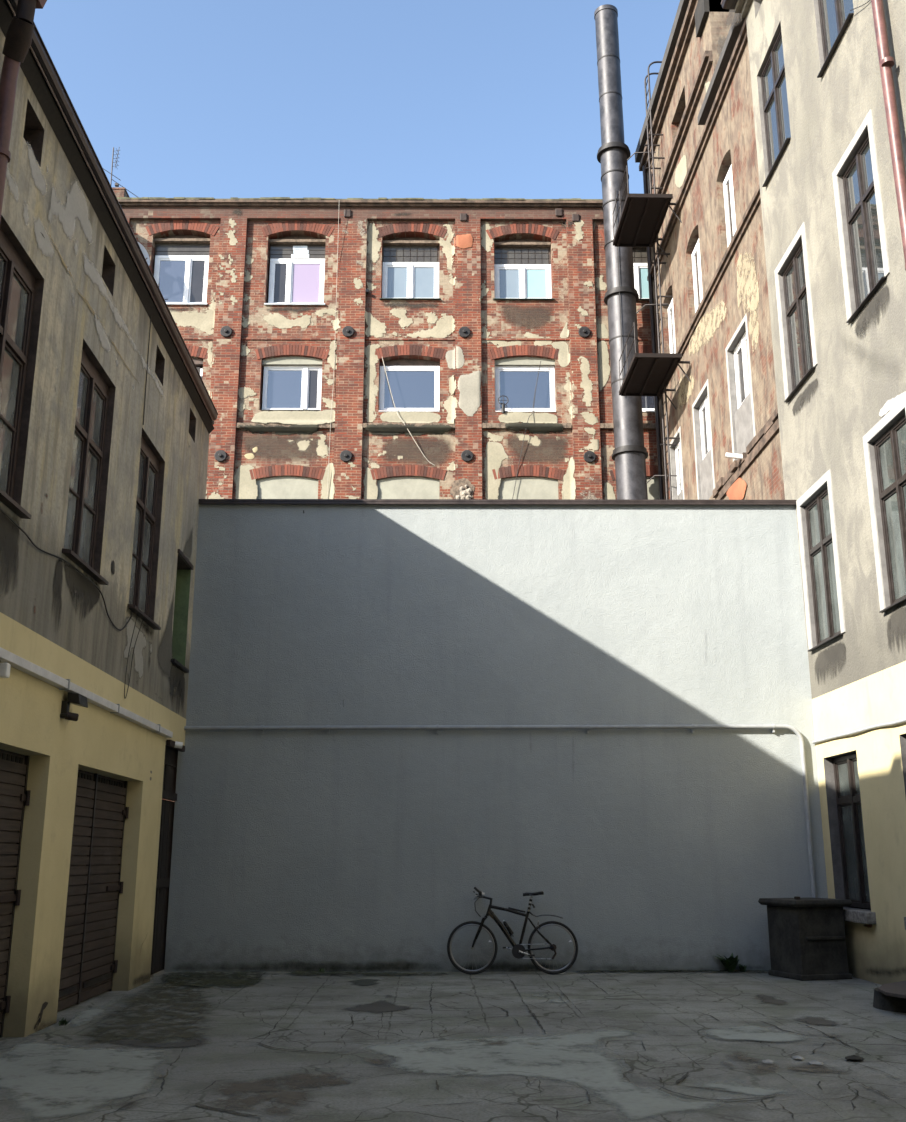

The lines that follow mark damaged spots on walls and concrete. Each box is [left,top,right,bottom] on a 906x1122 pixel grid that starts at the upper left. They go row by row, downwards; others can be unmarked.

peeling [354,261,376,305]
peeling [560,322,581,338]
peeling [322,375,336,409]
peeling [565,392,599,462]
spalling [447,461,475,499]
water stain [0,511,19,593]
water stain [53,559,100,622]
water stain [130,595,185,713]
crack [34,1002,48,1029]
crack [242,974,581,1053]
crack [424,1071,591,1118]
crack [605,1012,906,1117]